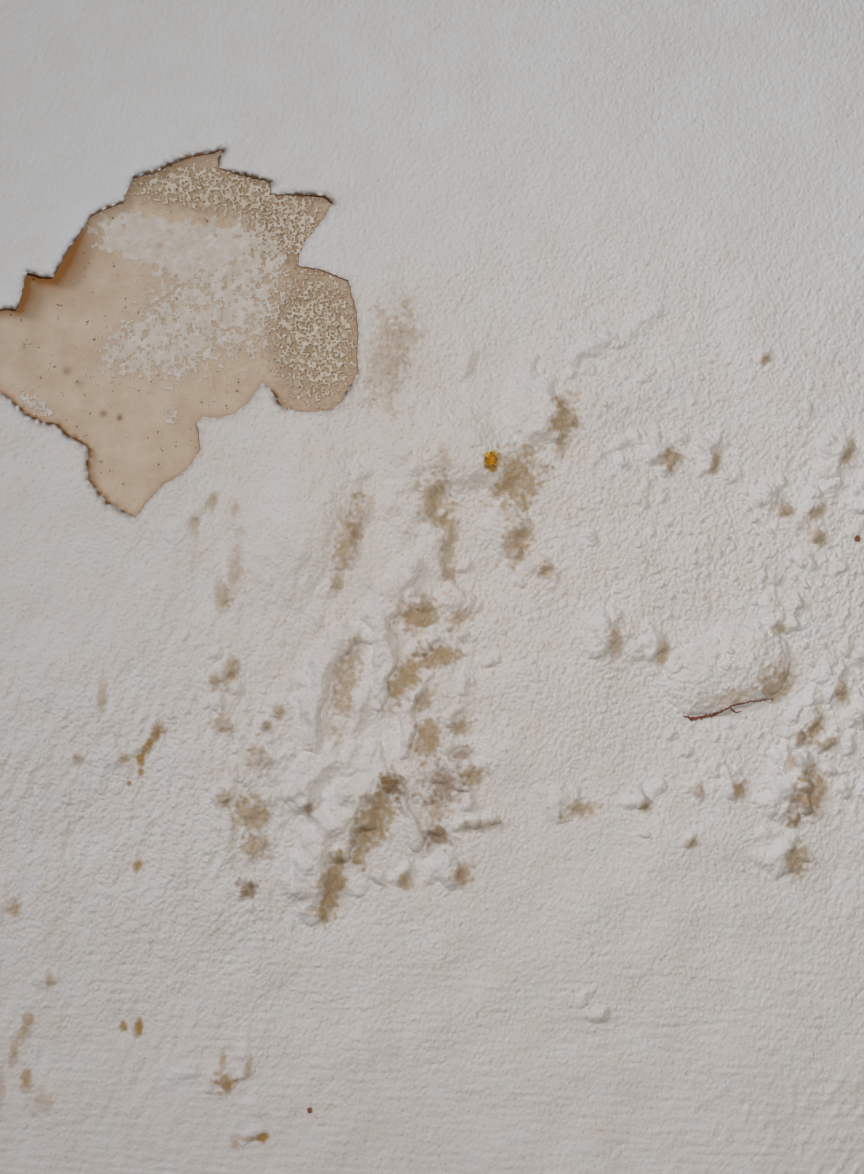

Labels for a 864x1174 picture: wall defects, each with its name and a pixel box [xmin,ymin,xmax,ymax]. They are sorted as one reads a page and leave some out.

peeling [0,128,381,541]
leakage [551,398,577,445]
leakage [484,446,540,508]
leakage [404,596,437,627]
leakage [387,648,458,706]
leakage [415,720,438,751]
leakage [798,720,833,741]
leakage [796,771,824,813]
leakage [316,777,399,921]